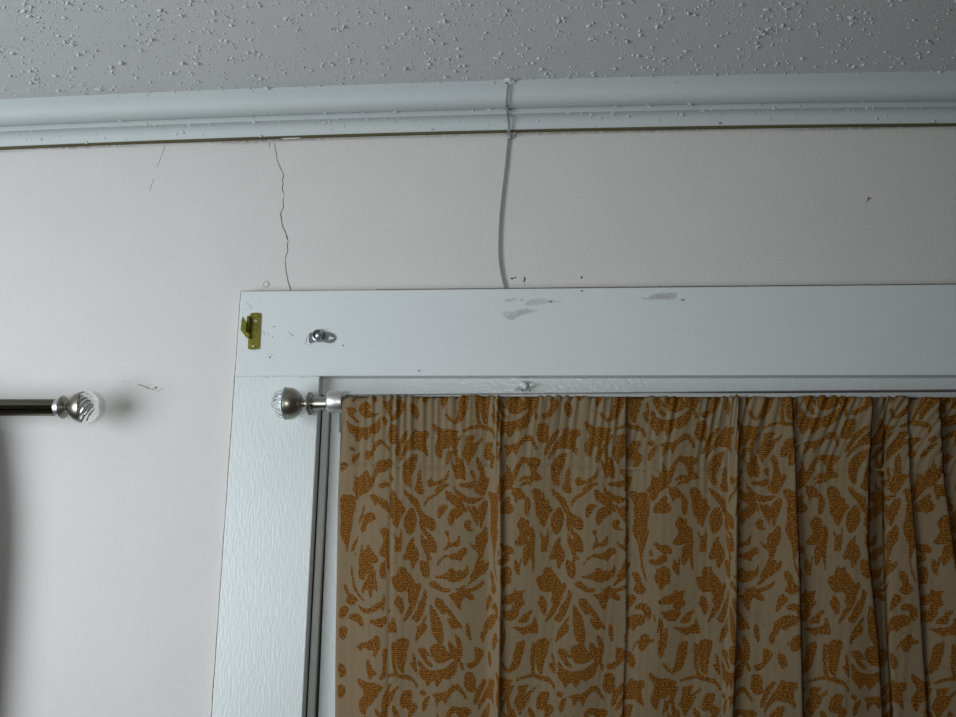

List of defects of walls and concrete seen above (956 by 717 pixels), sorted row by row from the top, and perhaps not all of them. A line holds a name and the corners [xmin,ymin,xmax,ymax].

crack [211,142,321,717]
crack [355,283,948,291]